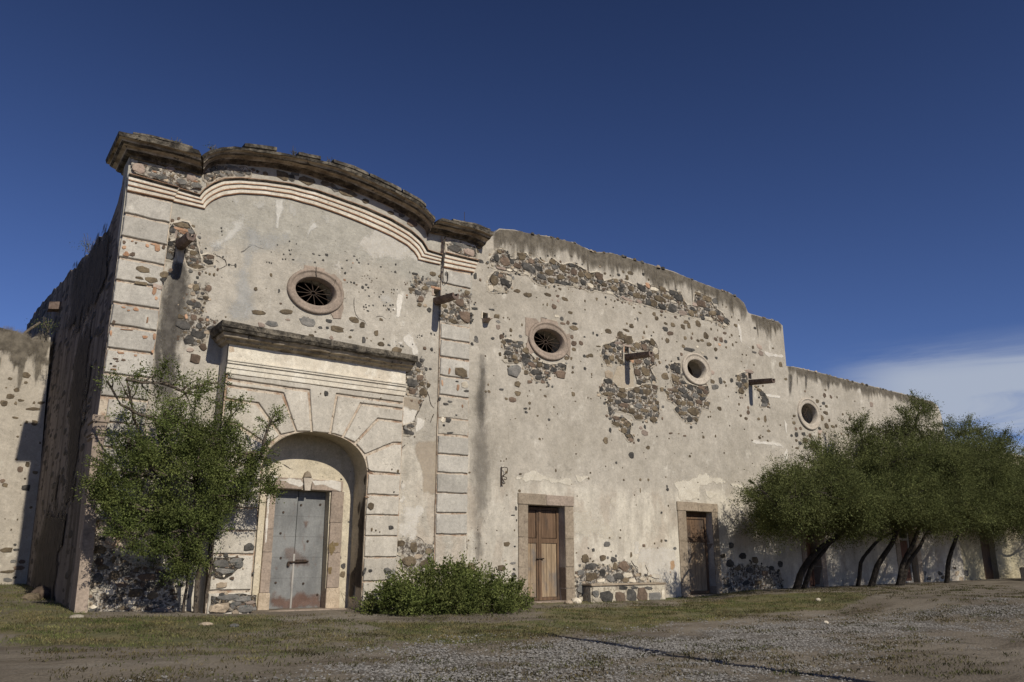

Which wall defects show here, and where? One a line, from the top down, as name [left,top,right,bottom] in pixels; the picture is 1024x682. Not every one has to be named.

leakage [0,326,50,387]
leakage [154,262,188,402]
spalling [122,217,237,364]
spalling [251,240,851,481]
leakage [494,229,781,335]
corrosion [271,593,320,609]
spalling [328,475,436,599]
spalling [566,529,677,601]